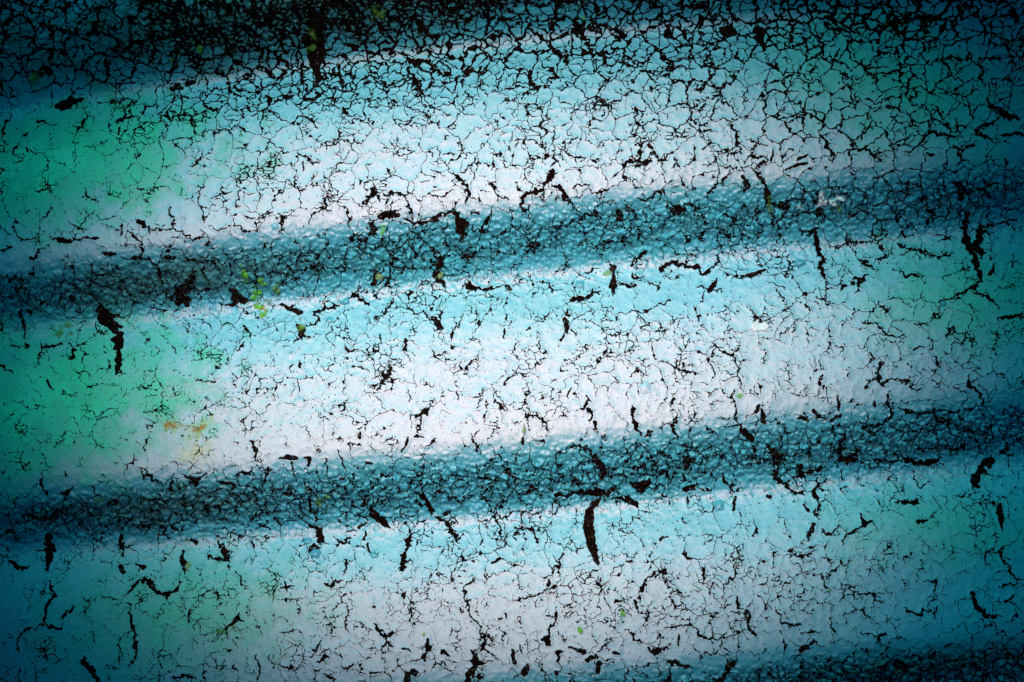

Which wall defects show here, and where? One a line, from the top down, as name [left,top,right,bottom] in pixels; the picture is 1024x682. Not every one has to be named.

peeling [55,96,84,111]
peeling [952,181,1017,309]
crack [697,278,727,302]
peeling [95,303,126,376]
crack [137,331,164,360]
crack [0,390,136,482]
crack [33,453,52,496]
peeling [570,442,617,565]
peeling [968,442,1015,491]
peeling [26,513,57,572]
crack [59,590,104,656]